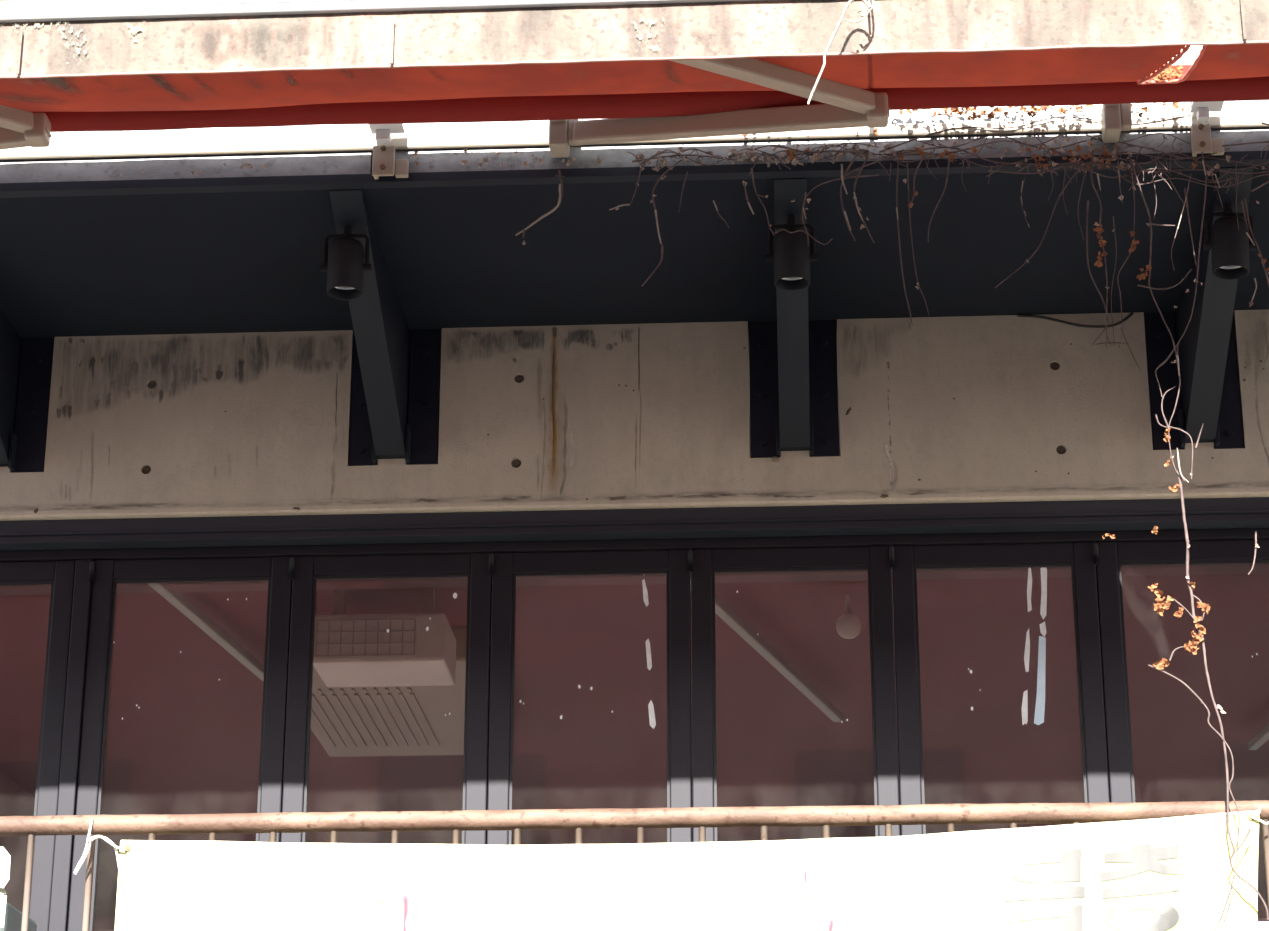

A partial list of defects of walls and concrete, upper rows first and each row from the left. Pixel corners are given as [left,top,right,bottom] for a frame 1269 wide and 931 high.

leakage [125,337,281,382]